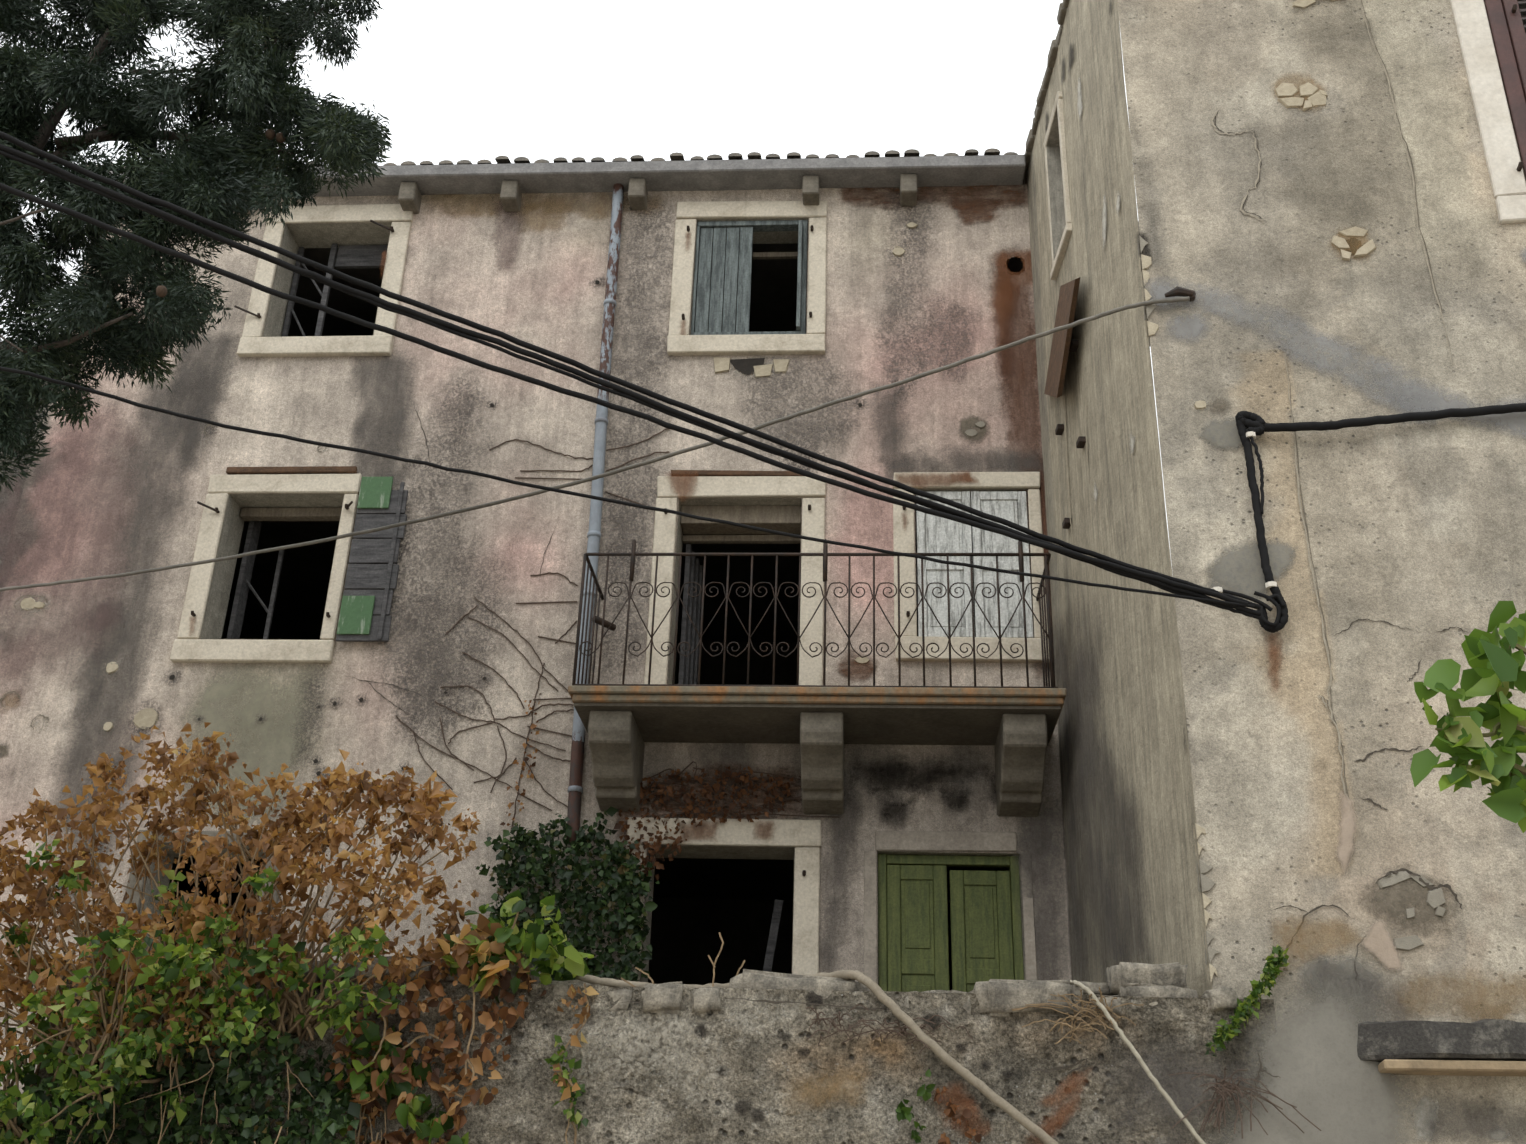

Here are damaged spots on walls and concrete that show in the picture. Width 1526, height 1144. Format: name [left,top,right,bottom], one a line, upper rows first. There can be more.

spalling [1274,80,1327,111]
crack [1211,111,1267,223]
spalling [1331,226,1376,261]
spalling [714,357,790,379]
corrosion [992,251,1053,632]
crack [1274,349,1467,982]
spalling [1362,868,1462,969]